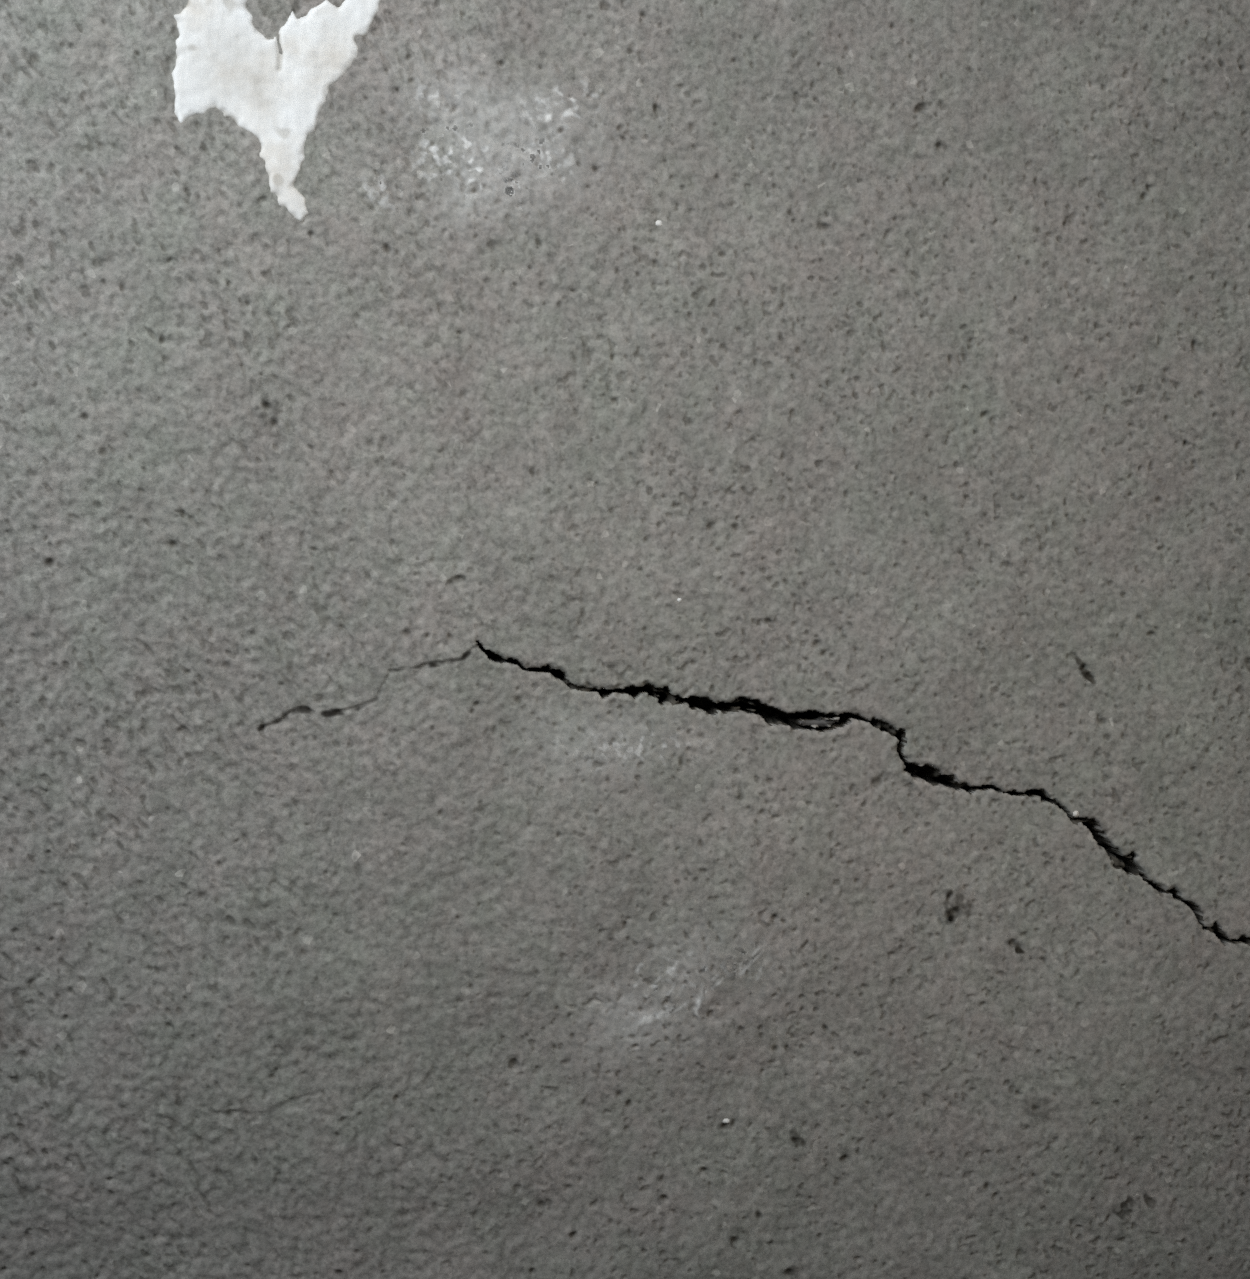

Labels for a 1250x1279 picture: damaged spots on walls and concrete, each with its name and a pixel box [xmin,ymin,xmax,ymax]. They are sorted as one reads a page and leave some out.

flaking render [172,0,381,222]
crack [260,707,359,730]
crack [429,641,1250,946]